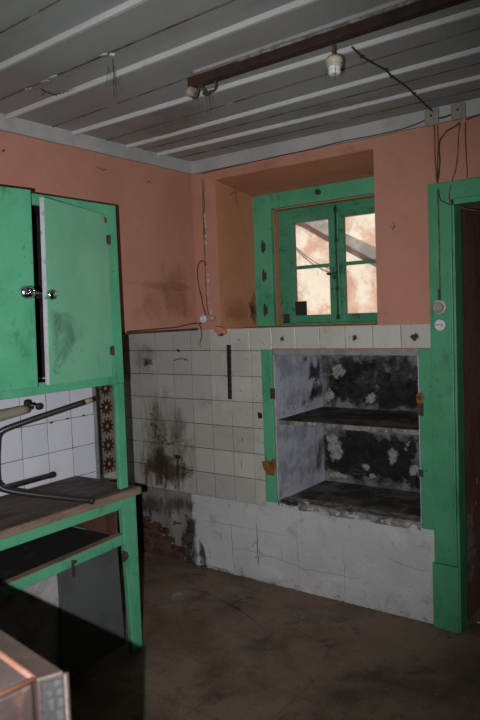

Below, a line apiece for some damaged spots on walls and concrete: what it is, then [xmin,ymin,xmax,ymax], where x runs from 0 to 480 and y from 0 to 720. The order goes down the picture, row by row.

leakage [305,355,418,411]
leakage [145,414,191,488]
leakage [324,428,420,489]
flaking render [136,506,189,562]
crack [202,520,361,599]
spalling [278,496,421,531]